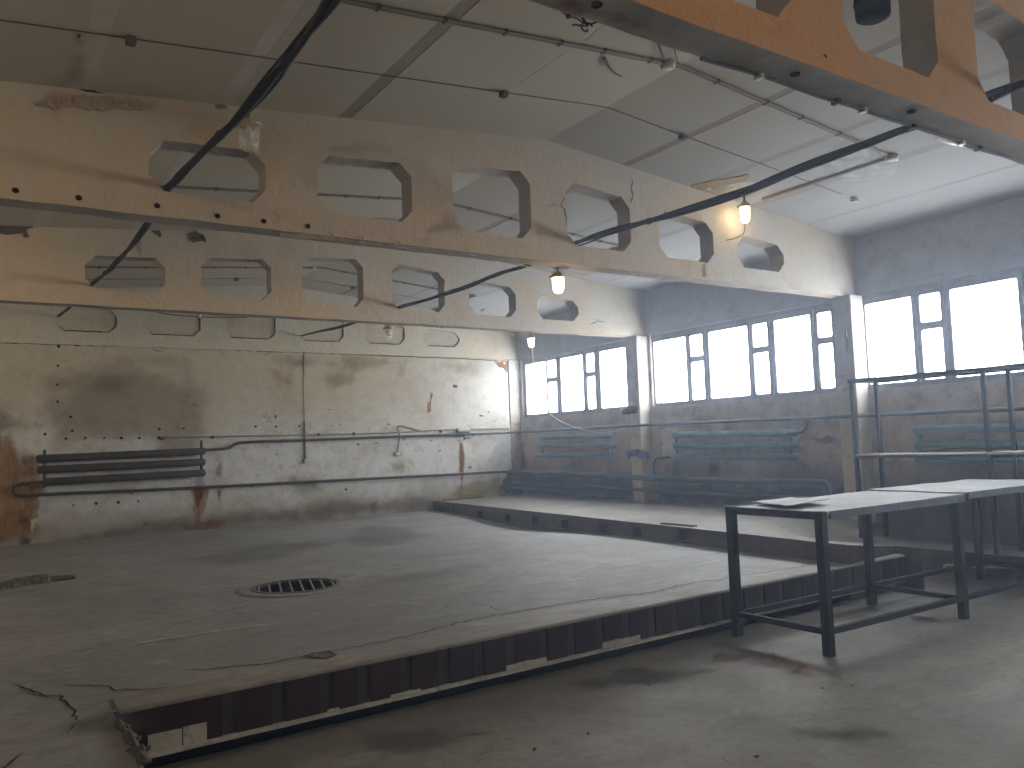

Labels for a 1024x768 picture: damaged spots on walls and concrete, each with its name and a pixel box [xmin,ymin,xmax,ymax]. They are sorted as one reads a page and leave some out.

spalling [34,94,151,112]
peeling [691,174,750,193]
rust [0,440,43,544]
rust [187,489,221,530]
crack [12,684,167,733]
spalling [114,718,152,767]